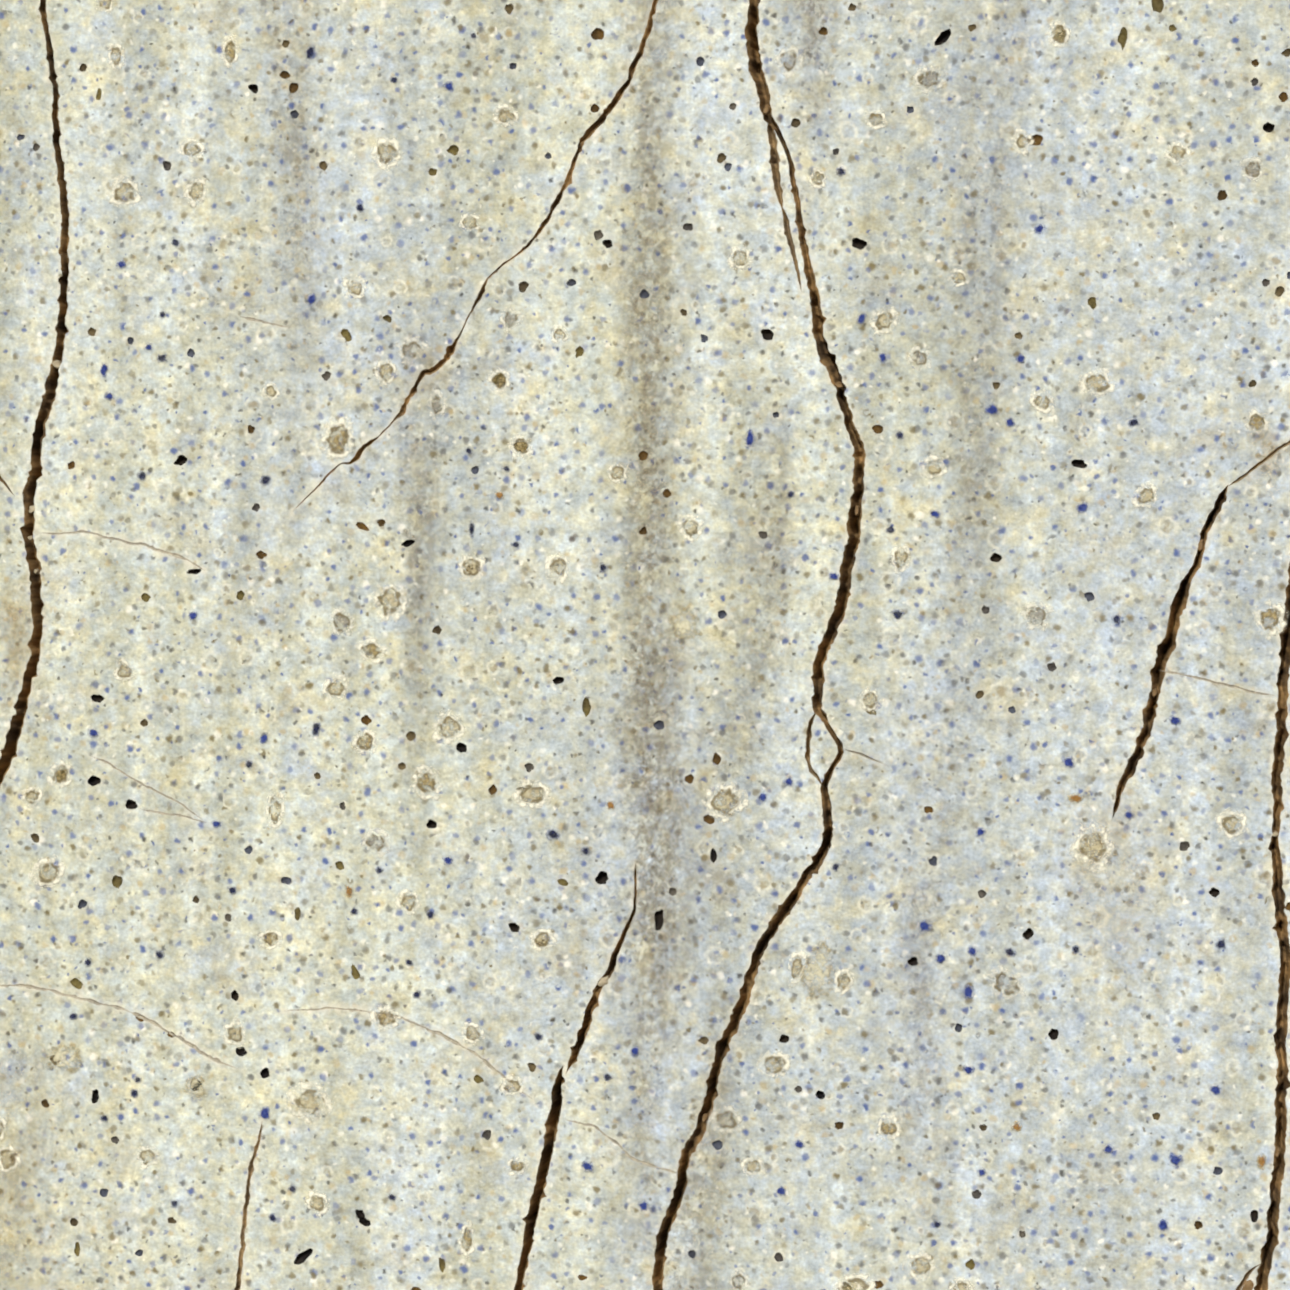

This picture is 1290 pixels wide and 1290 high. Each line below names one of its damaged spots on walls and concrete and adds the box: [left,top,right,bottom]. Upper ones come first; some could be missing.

crack [0,0,205,785]
crack [94,757,206,823]
crack [234,1123,262,1290]
crack [287,0,885,1290]
crack [1112,440,1290,1290]